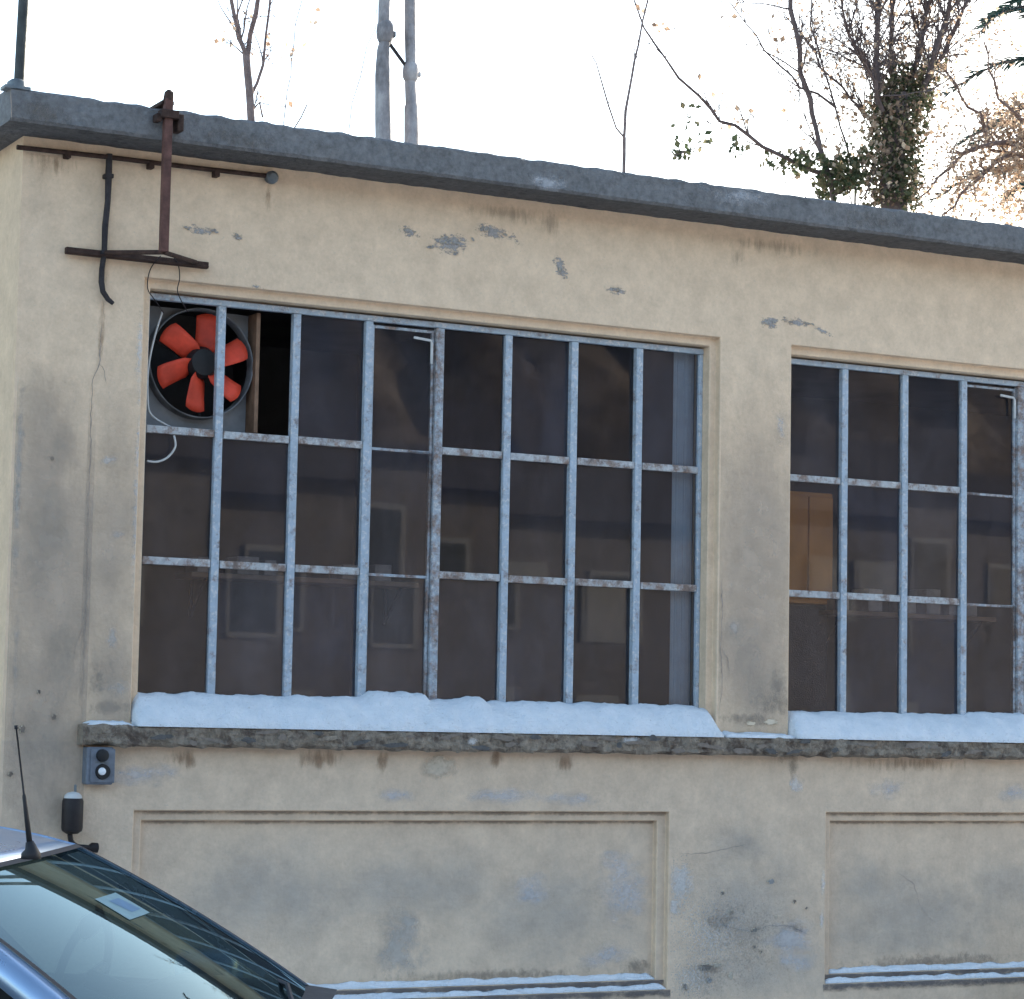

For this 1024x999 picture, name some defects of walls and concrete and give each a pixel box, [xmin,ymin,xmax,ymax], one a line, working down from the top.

peeling [427,224,517,255]
peeling [761,317,830,336]
crack [74,311,106,714]